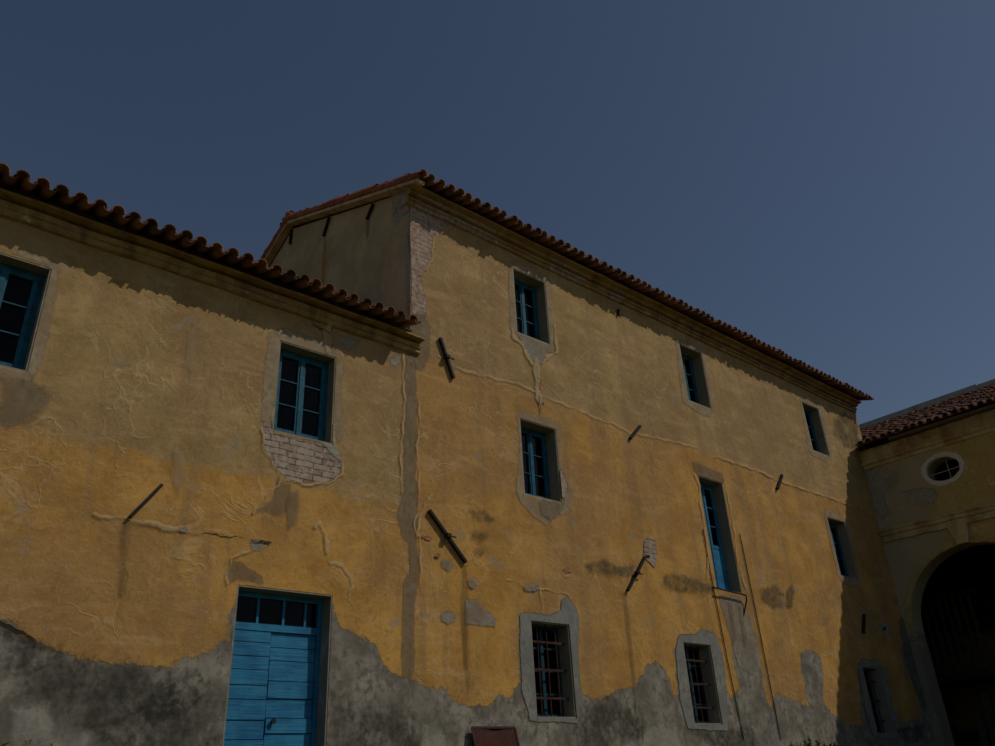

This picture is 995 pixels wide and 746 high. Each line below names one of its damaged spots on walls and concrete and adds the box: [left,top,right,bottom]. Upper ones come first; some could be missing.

flaking render [409,192,497,369]
flaking render [261,328,344,486]
crack [93,513,260,541]
flaking render [0,602,236,746]
flaking render [441,577,496,627]
flaking render [326,598,936,746]